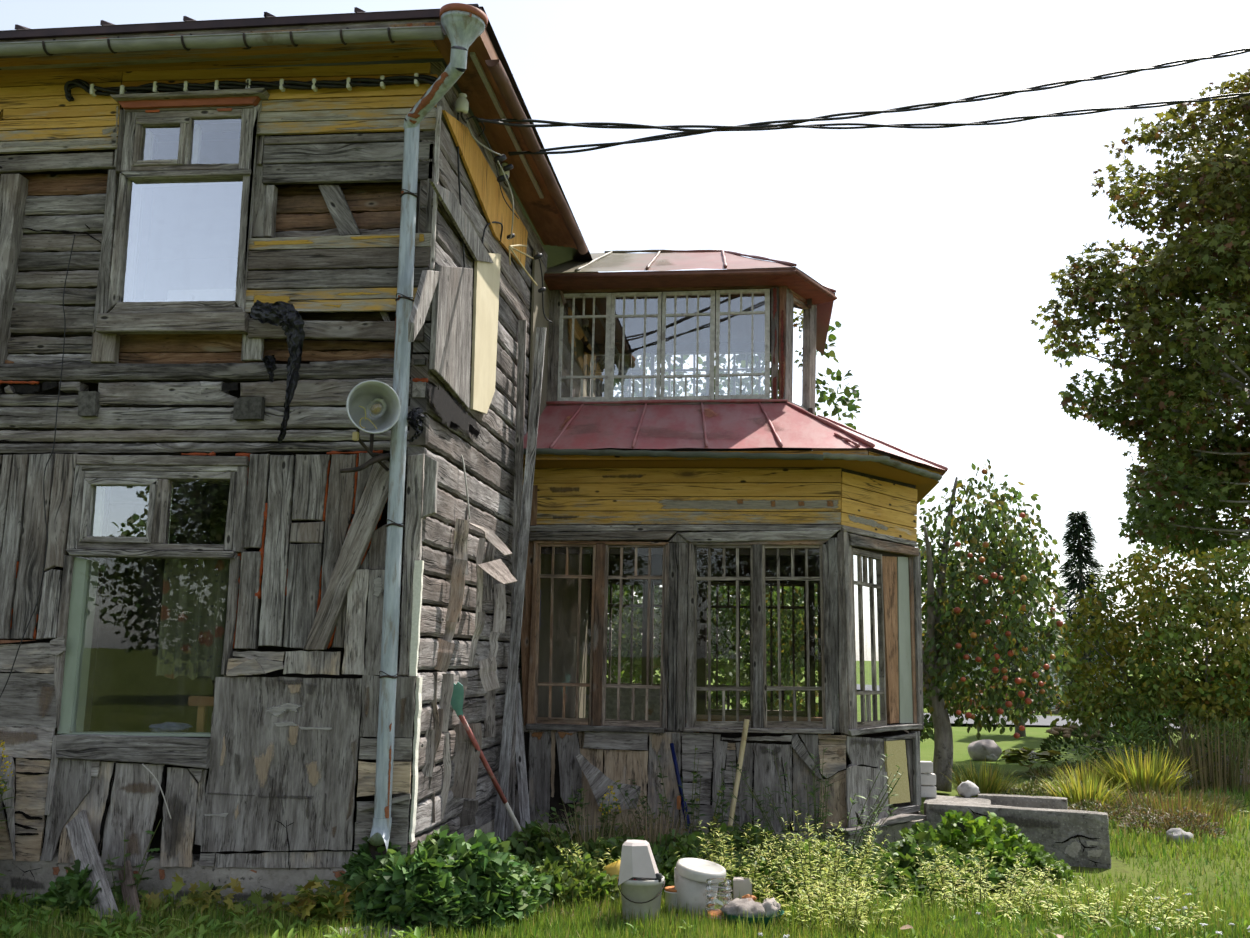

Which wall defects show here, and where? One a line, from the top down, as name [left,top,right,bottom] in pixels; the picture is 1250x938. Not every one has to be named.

peeling [252,295,290,306]
peeling [597,499,888,530]